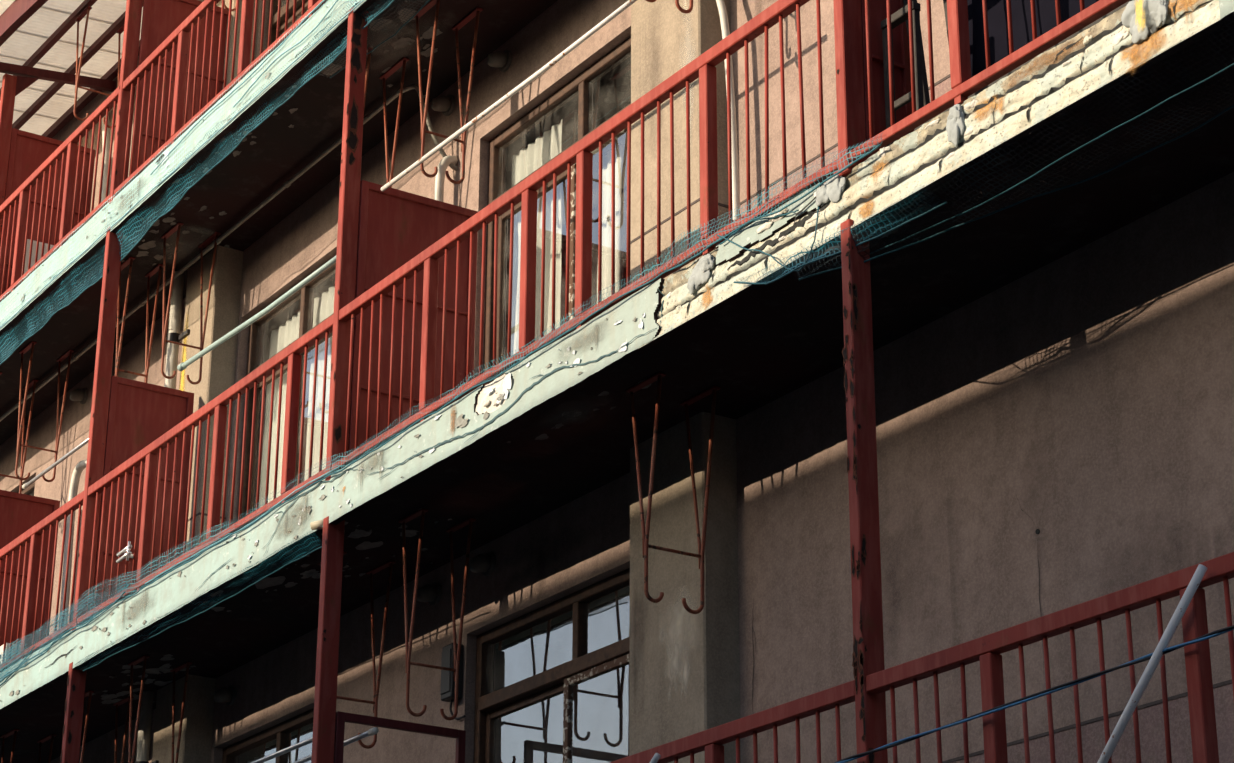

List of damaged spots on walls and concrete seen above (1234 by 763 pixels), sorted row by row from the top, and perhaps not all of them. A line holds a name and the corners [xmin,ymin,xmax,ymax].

spalling [434,372,514,428]
crack [263,0,1213,553]
spalling [606,0,1228,352]
corrosion [1122,0,1198,70]